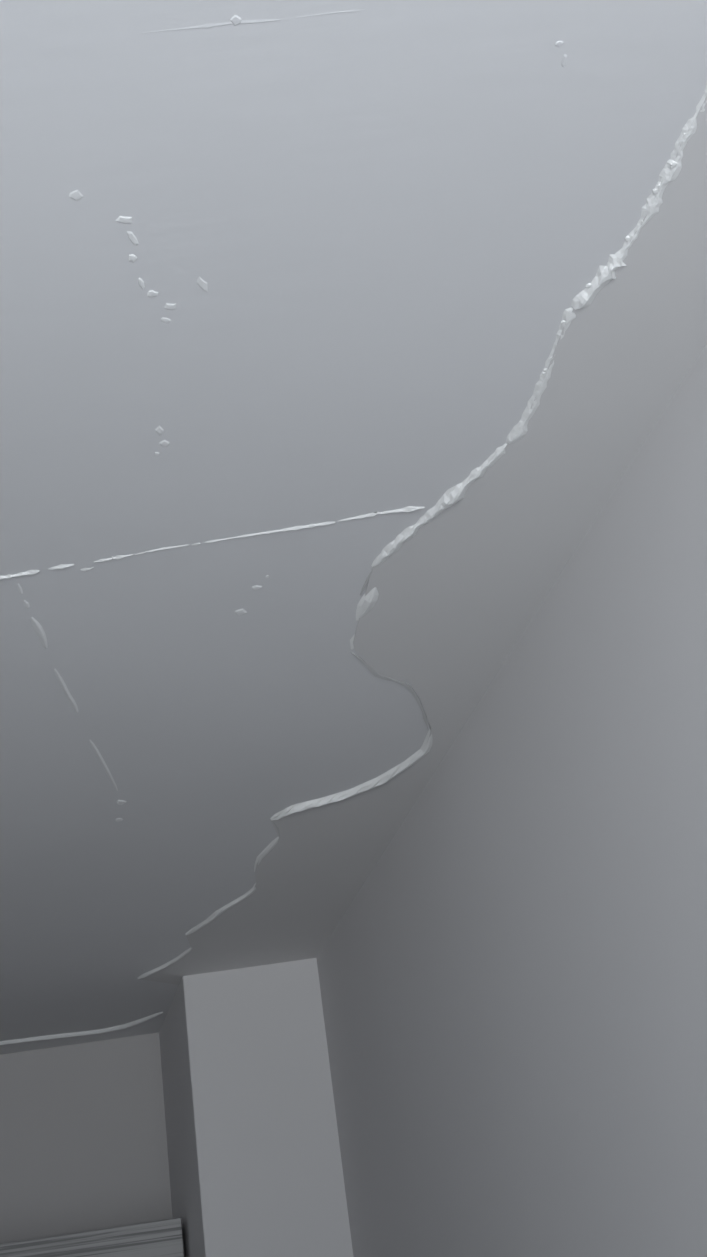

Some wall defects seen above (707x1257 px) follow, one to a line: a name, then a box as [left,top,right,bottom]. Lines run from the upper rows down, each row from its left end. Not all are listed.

crack [0,82,707,979]